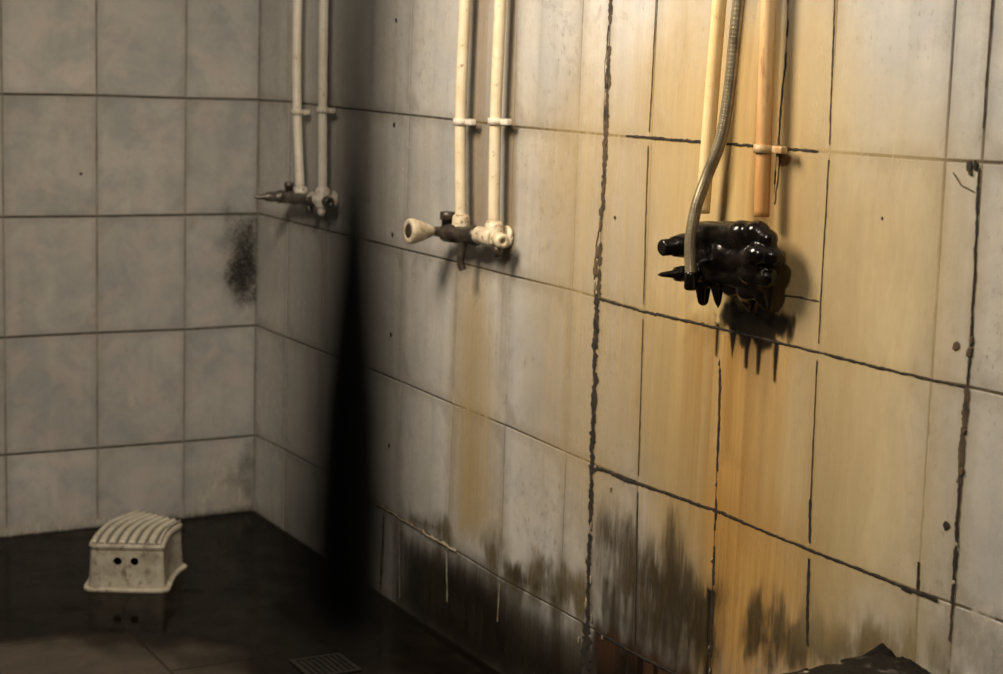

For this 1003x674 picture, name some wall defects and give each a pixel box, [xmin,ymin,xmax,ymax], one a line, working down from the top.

rust [665,26,797,251]
crack [982,0,993,128]
damp [229,225,255,299]
damp [410,515,450,601]
damp [486,542,591,622]
crack [578,0,637,674]
damp [600,519,715,674]
rust [651,255,803,674]
rust [821,91,925,589]
crack [901,160,981,641]